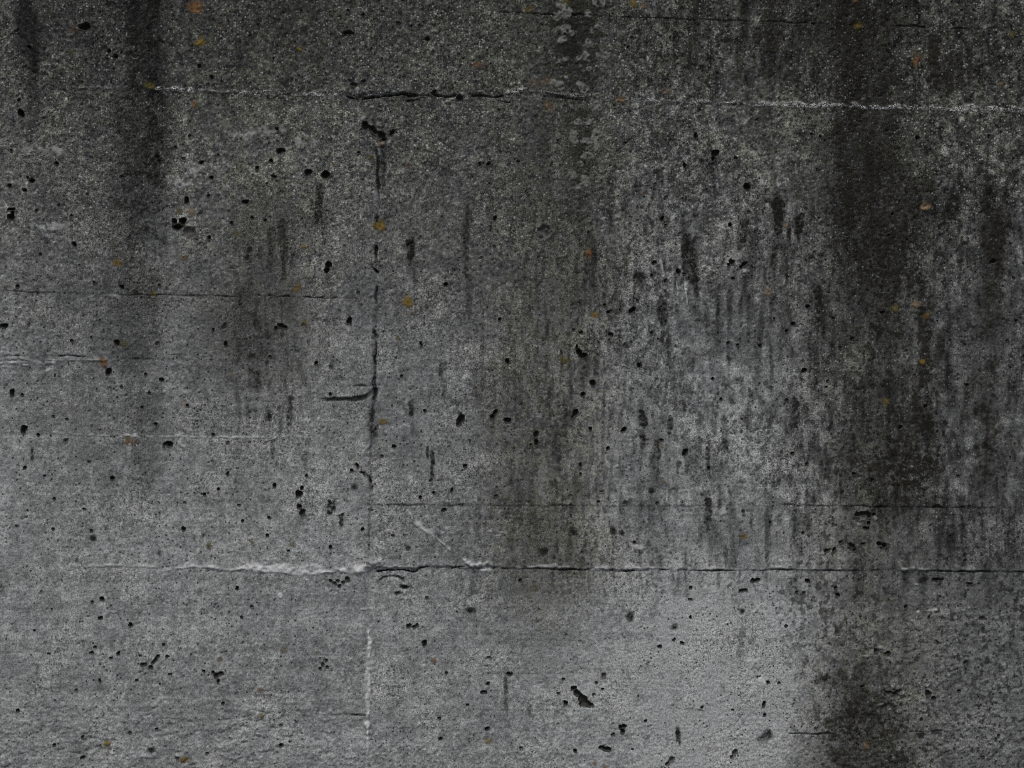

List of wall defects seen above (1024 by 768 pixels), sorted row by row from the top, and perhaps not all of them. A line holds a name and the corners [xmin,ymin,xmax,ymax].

damp [548,0,610,180]
crack [374,150,382,188]
crack [371,217,379,302]
damp [677,233,699,306]
damp [737,0,959,526]
damp [656,294,669,325]
damp [639,409,673,459]
damp [704,487,720,525]
crack [454,565,666,573]
damp [813,656,913,768]